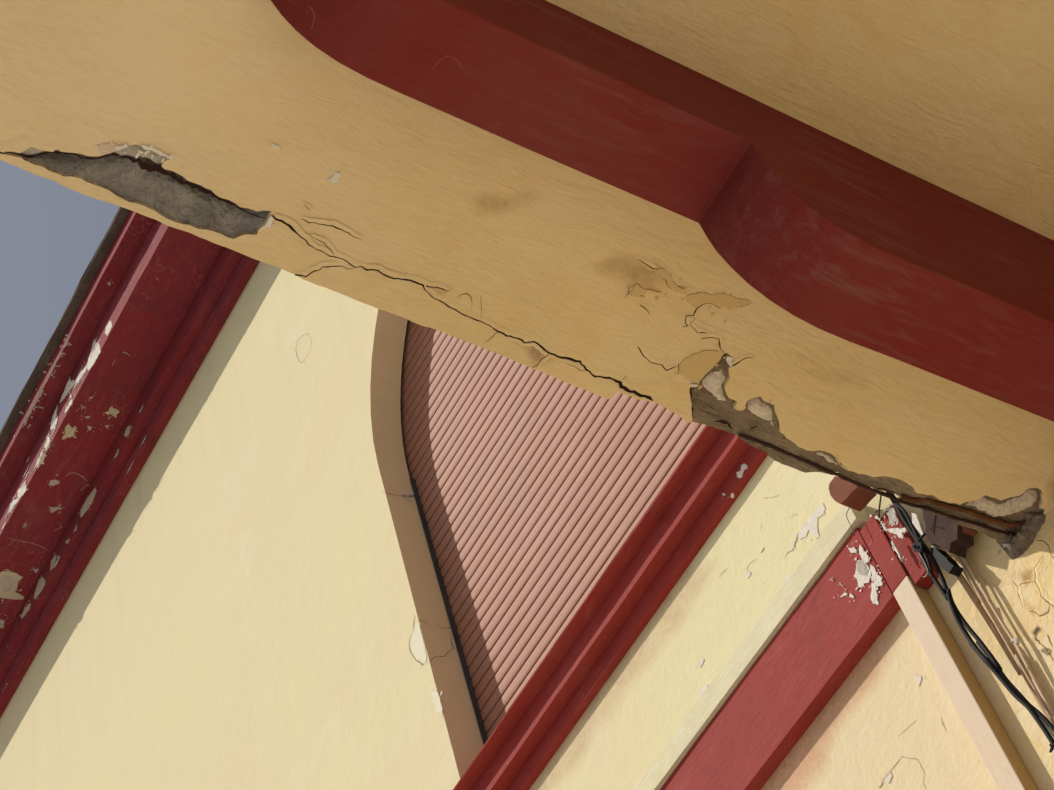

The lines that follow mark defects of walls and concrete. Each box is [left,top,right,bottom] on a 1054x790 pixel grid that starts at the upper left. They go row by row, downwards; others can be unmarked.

spalling [4,139,274,238]
crack [272,202,681,402]
peeling [628,266,752,323]
peeling [0,321,119,533]
peeling [65,488,97,544]
spalling [677,345,1046,564]
peeling [0,553,60,629]
crack [1014,537,1054,661]